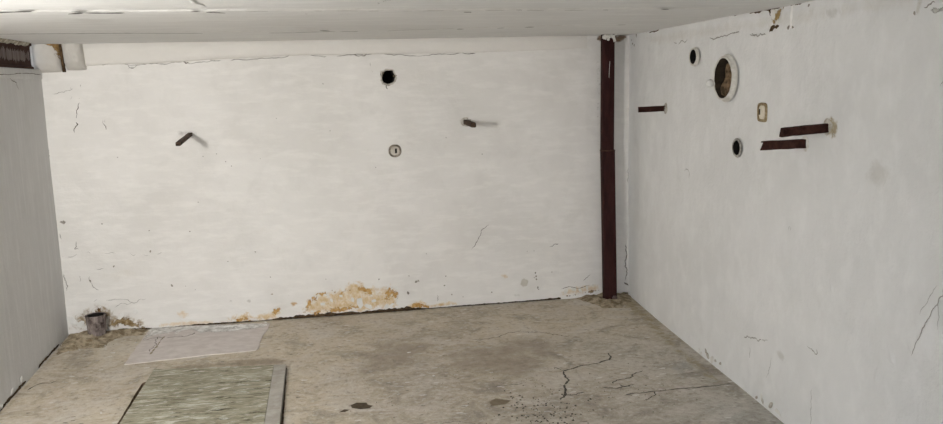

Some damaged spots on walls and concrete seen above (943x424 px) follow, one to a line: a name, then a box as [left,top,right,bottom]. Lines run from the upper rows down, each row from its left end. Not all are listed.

spalling [752,7,794,37]
crack [298,30,475,66]
crack [0,11,121,133]
damp [67,303,215,331]
crack [912,287,943,354]
crack [554,353,725,400]